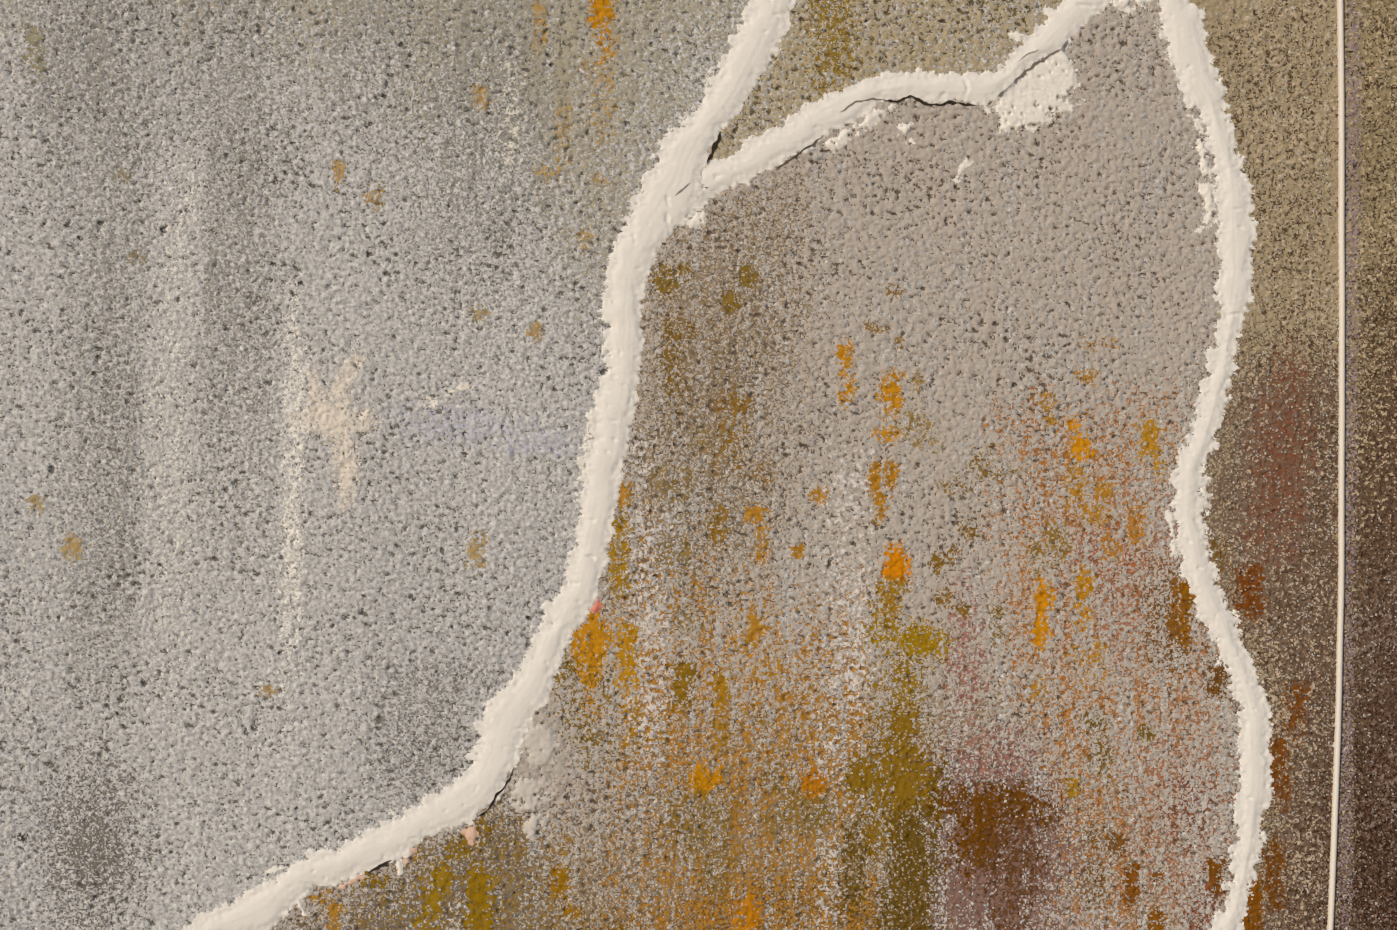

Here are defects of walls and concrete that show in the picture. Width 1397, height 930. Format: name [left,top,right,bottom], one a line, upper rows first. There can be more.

rust [469,78,492,112]
rust [530,0,624,184]
rust [526,320,544,349]
rust [881,283,904,300]
crack [183,0,1110,930]
crack [1154,0,1275,930]
rust [1209,336,1321,627]
rust [546,311,1290,930]
rust [1269,677,1314,813]